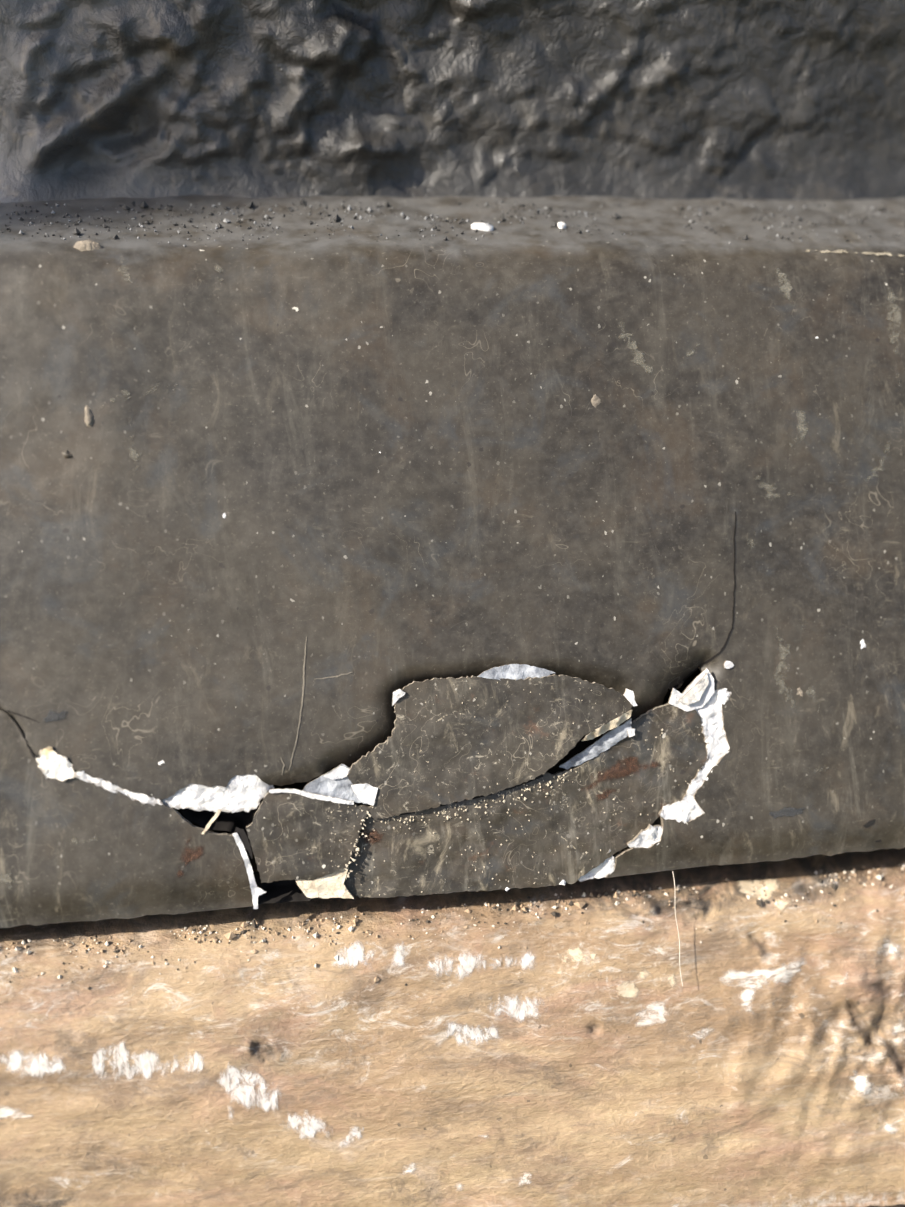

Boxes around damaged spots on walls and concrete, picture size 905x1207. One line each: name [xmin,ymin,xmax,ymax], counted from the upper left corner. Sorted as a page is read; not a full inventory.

crack [670,512,737,692]
crack [0,708,40,757]
peeling [36,661,734,899]
crack [371,773,566,834]
crack [232,827,267,909]